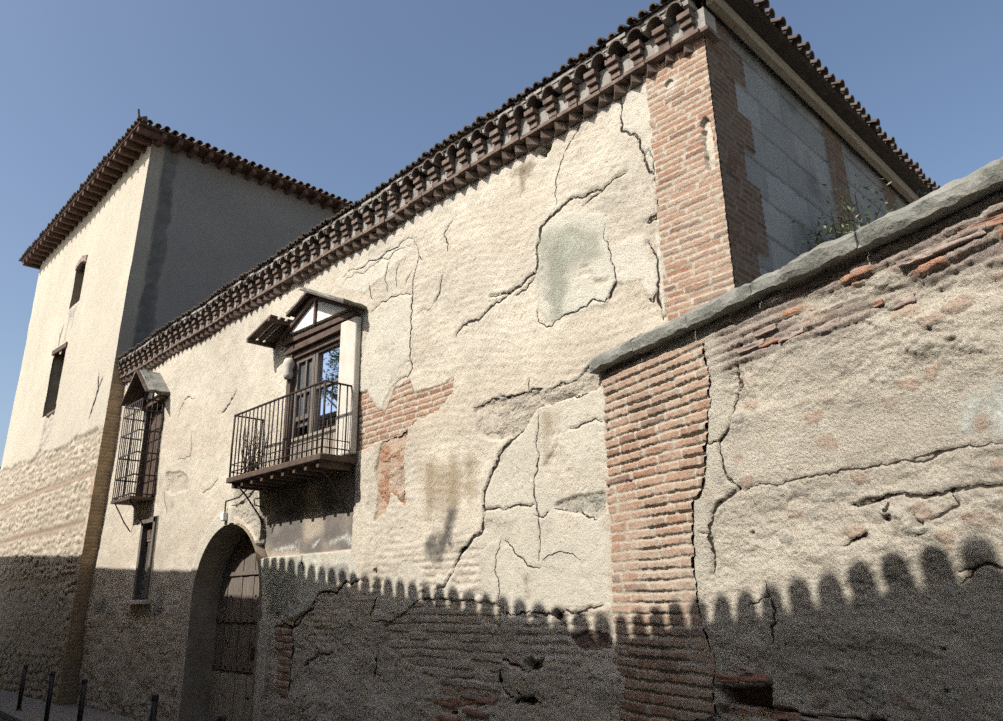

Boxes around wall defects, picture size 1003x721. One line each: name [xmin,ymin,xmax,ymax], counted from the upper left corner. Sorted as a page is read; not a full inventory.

crack [344,237,443,386]
crack [456,98,664,337]
flaking render [736,318,841,355]
flaking render [873,293,917,310]
flaking render [896,214,1003,268]
flaking render [356,377,454,510]
crack [275,365,604,630]
crack [700,335,1003,574]
flaking render [386,599,504,721]
spalling [572,631,612,651]
crack [751,583,776,642]
crack [958,561,1003,584]